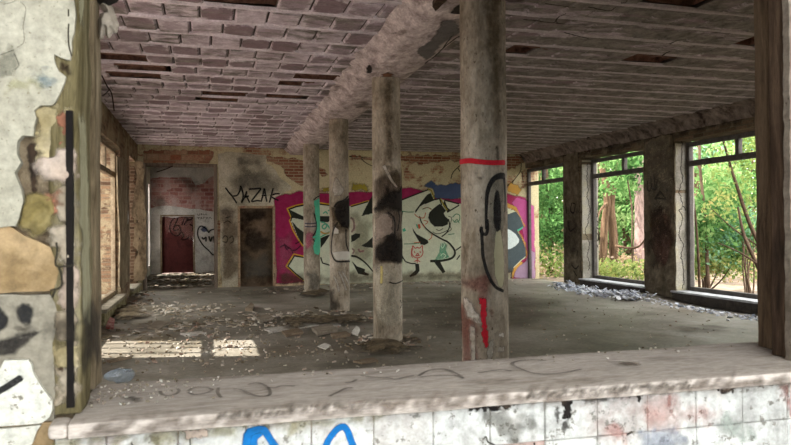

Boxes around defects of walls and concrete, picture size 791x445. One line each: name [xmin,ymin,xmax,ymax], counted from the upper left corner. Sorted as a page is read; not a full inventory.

peeling [0,104,91,445]
peeling [116,149,303,289]